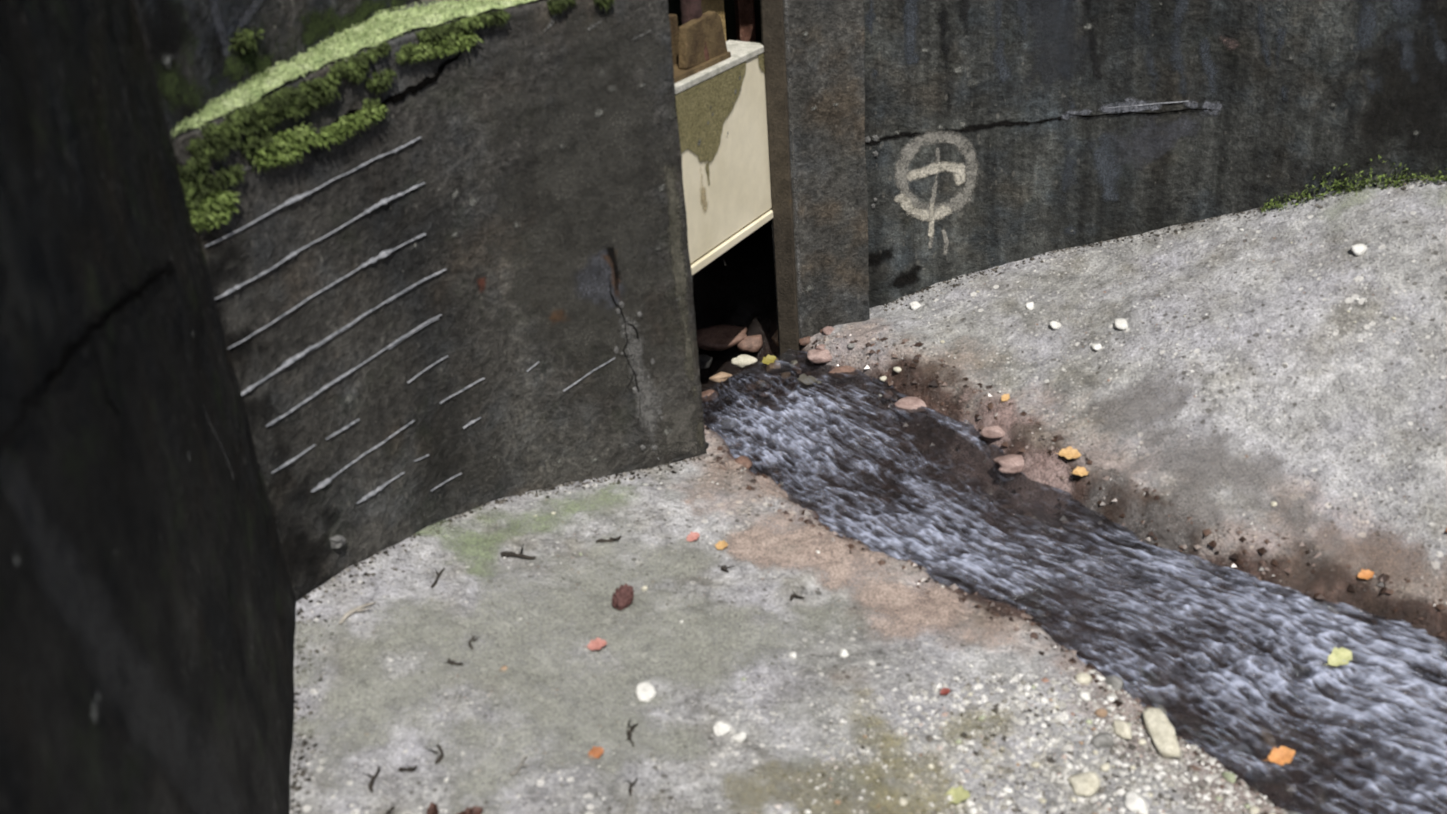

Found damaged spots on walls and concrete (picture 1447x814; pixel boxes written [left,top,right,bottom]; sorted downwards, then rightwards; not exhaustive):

crack [325,51,466,132]
crack [865,109,1215,145]
crack [0,260,175,455]